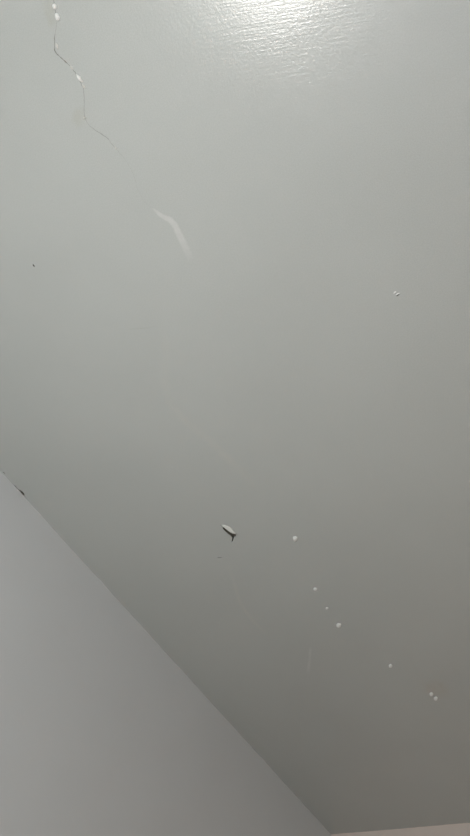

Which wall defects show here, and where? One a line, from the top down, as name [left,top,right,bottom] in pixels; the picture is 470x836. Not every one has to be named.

crack [41,0,152,208]